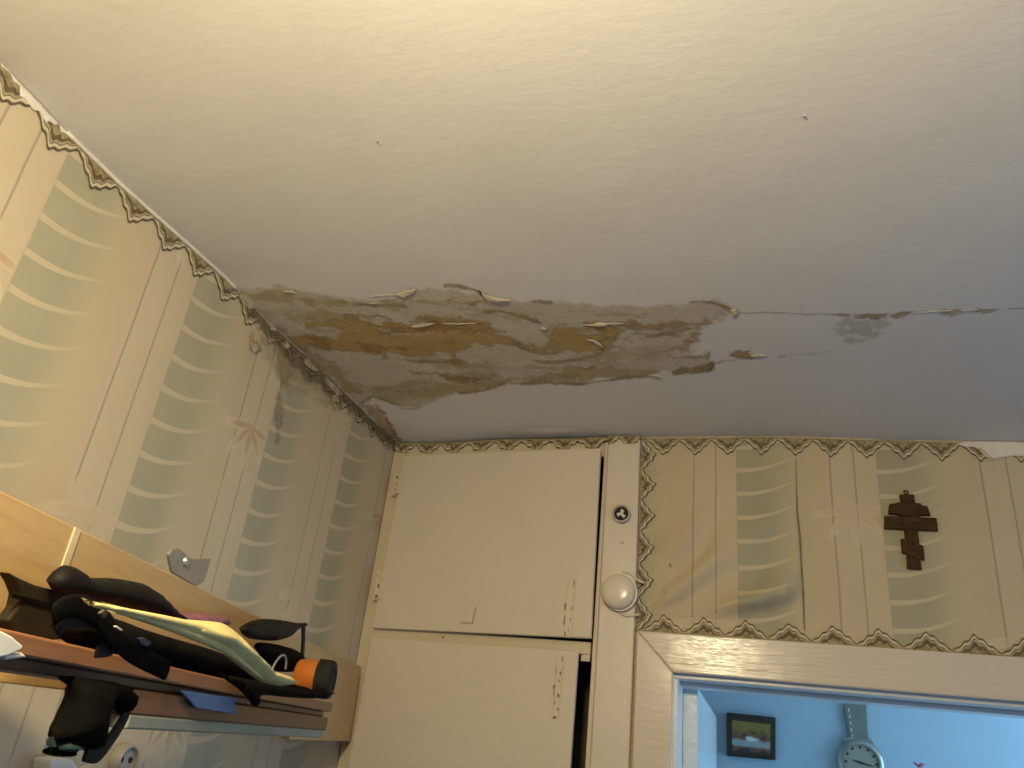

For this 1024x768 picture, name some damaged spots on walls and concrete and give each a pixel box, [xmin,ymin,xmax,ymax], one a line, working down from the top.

crack [738,308,1024,320]